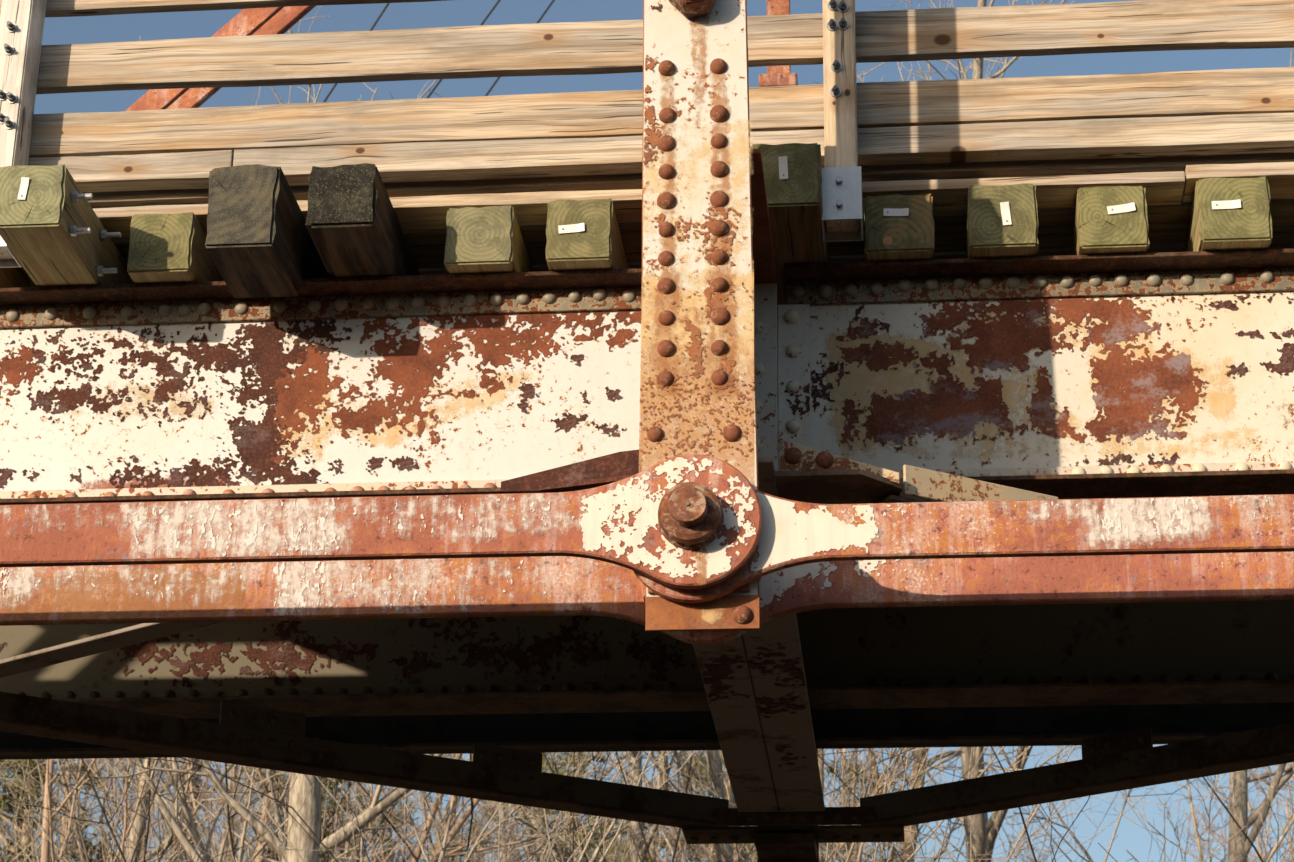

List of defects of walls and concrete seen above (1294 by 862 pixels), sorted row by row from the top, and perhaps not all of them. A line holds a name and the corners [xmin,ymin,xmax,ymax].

rust [0,17,754,489]
peeling [1195,291,1294,310]
peeling [849,305,891,332]
peeling [1226,328,1294,379]
rust [784,296,1253,458]
peeling [517,382,541,413]
peeling [605,387,622,401]
peeling [551,390,626,437]
peeling [1062,451,1180,466]
peeling [3,505,49,525]
peeling [111,455,915,616]